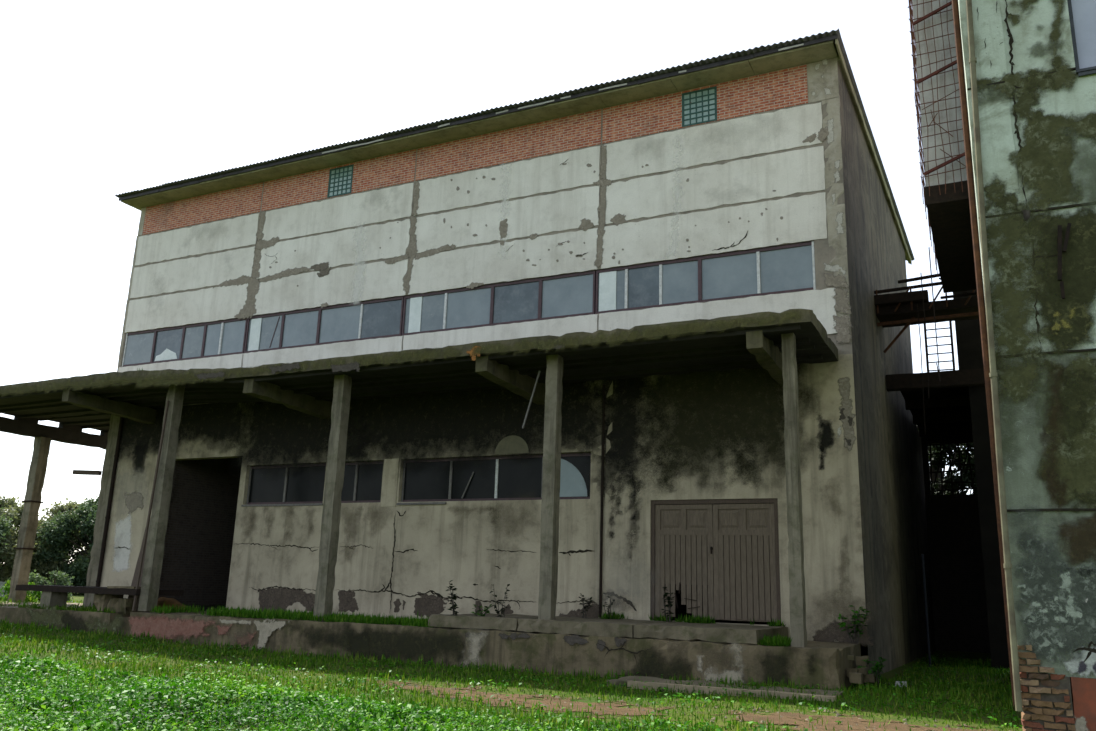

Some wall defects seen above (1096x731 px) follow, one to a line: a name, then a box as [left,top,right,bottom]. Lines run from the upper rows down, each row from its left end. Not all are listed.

crack [977,0,1022,151]
water stain [118,407,165,472]
water stain [176,402,331,475]
water stain [346,388,545,470]
water stain [561,367,786,558]
water stain [797,363,817,445]
peeling [129,615,289,648]
crack [241,511,593,610]
peeling [1017,570,1091,621]
flaking render [1017,641,1096,731]